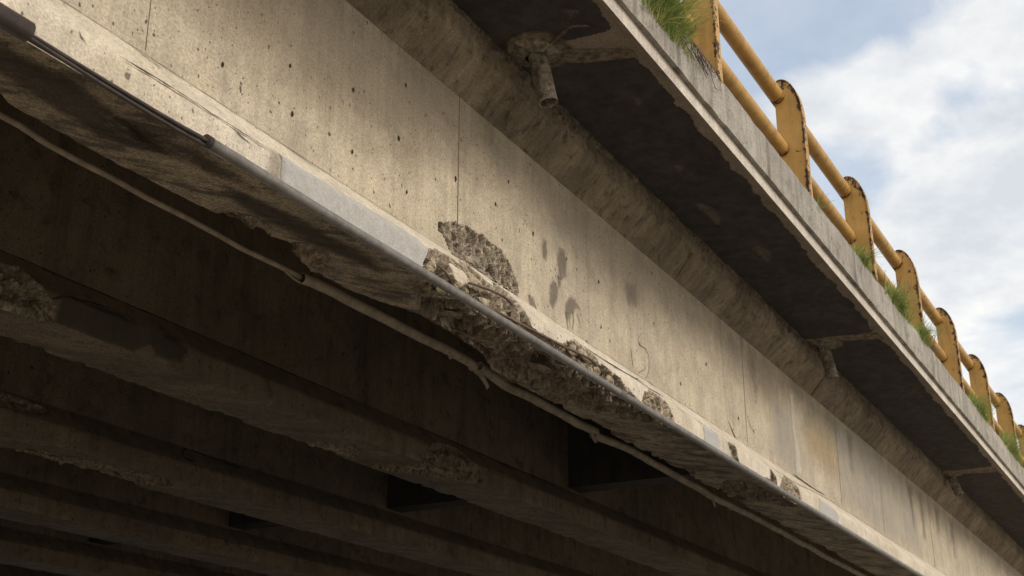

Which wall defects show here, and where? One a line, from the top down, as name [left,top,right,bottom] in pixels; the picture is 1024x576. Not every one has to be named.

crack [62,0,404,223]
spalling [284,240,332,278]
spalling [407,221,675,428]
damp [452,0,1024,549]
spalling [728,442,739,462]
spalling [712,469,802,507]